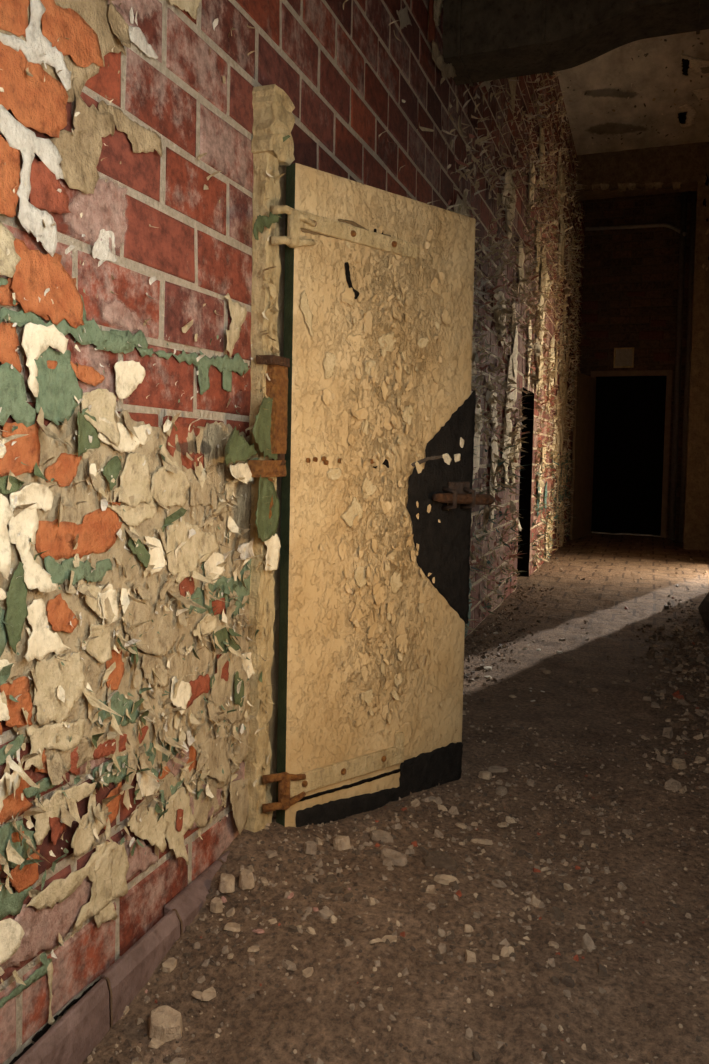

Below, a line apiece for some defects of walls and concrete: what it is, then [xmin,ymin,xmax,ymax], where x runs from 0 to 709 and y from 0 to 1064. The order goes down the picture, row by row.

flaking render [428,0,456,86]
peeling [332,72,586,735]